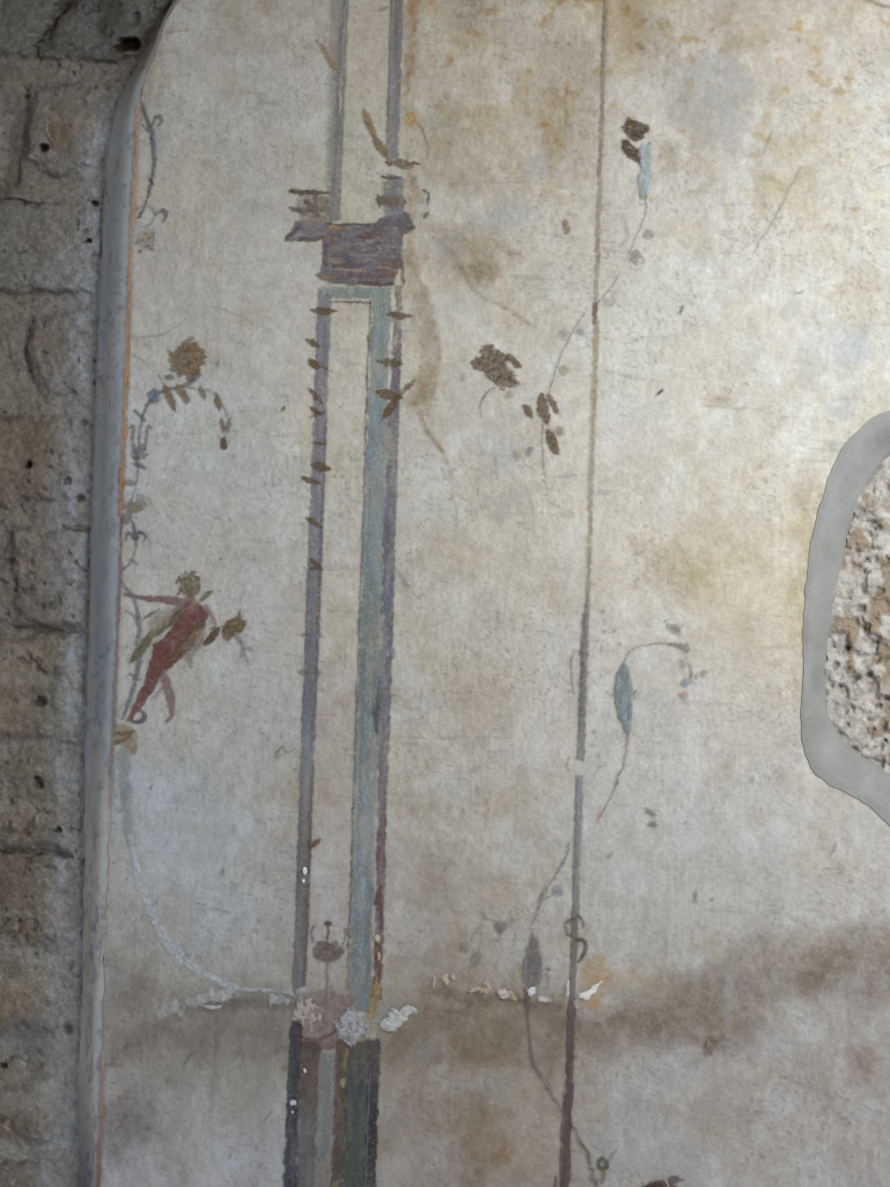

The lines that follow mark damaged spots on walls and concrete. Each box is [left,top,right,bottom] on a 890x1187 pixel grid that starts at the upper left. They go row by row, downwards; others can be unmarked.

flaking render [158,988,231,1018]
flaking render [293,997,322,1031]
flaking render [335,1006,416,1046]